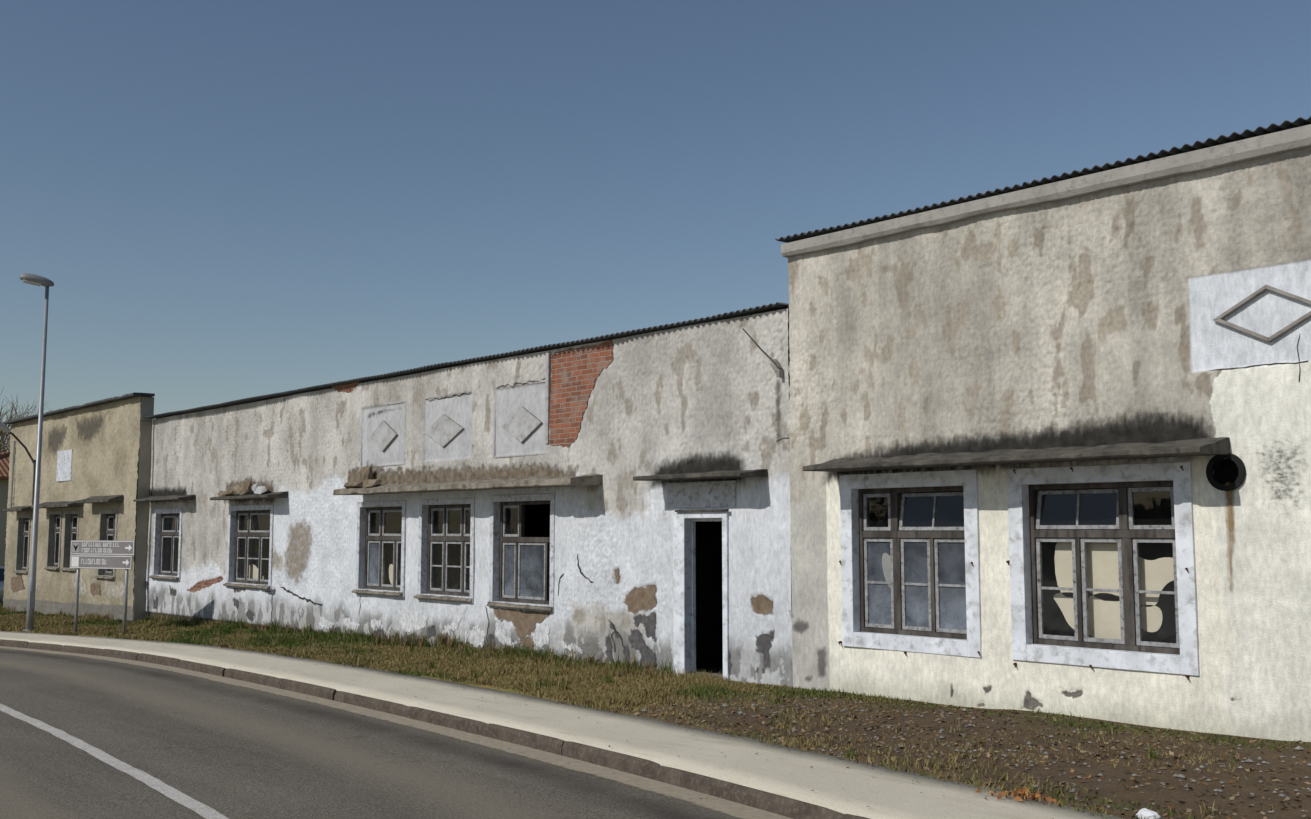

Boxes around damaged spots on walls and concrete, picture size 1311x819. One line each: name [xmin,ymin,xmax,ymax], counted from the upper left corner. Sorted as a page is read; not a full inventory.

flaking render [549,340,613,448]
corrosion [1226,484,1234,572]
flaking render [145,576,254,623]
flaking render [605,568,657,670]
flaking render [751,595,772,615]
peeling [756,630,774,673]
flaking render [1021,691,1042,710]